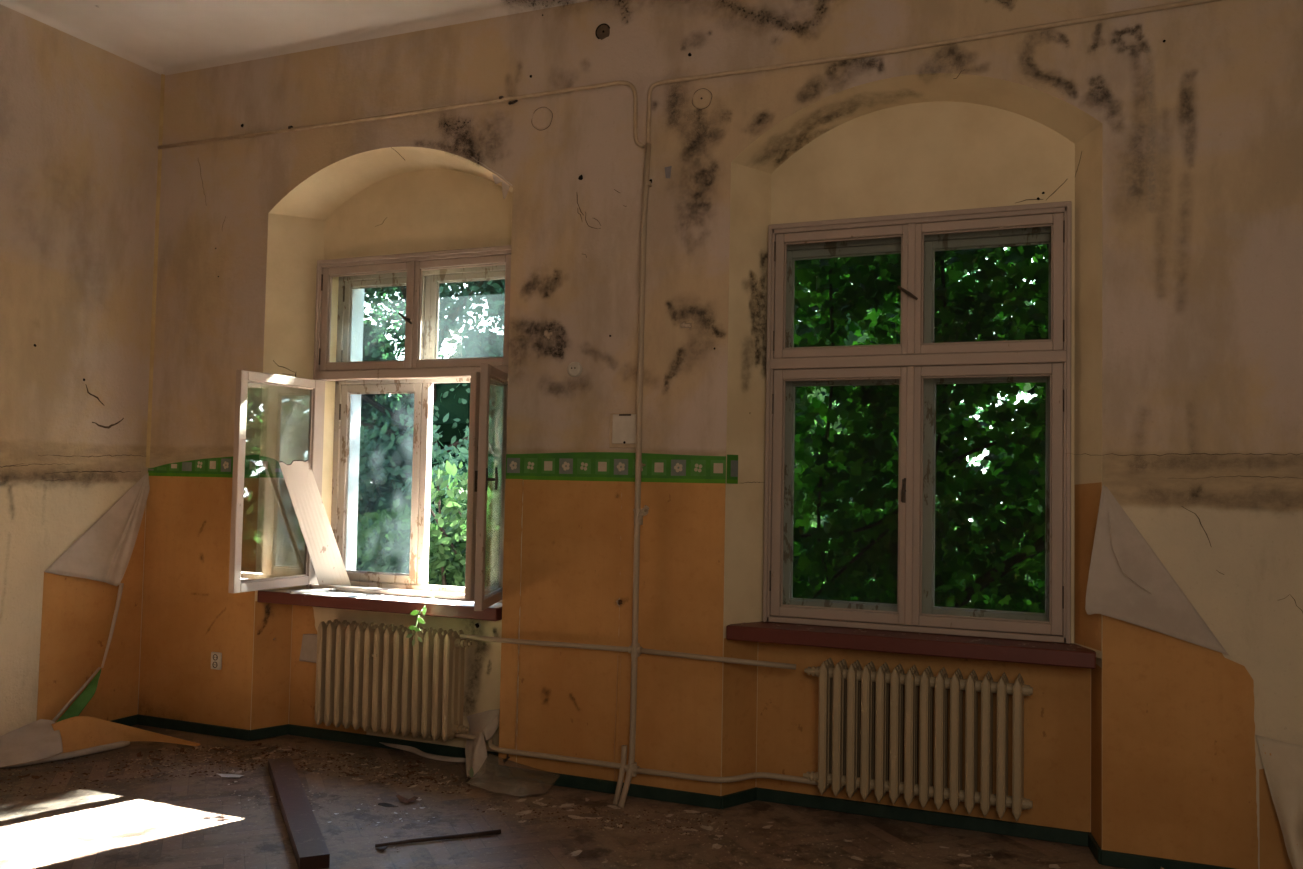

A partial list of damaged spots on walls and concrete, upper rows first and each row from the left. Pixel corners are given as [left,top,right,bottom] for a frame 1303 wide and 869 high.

leakage [526,323,566,357]
peeling [44,473,150,722]
peeling [1085,485,1228,655]